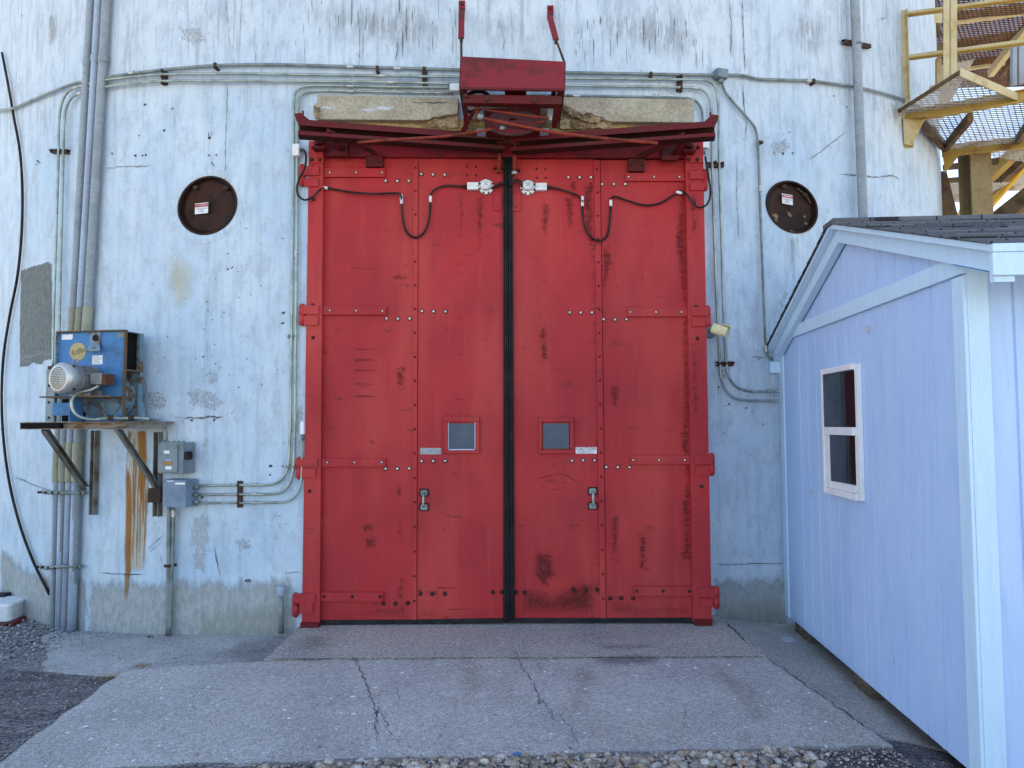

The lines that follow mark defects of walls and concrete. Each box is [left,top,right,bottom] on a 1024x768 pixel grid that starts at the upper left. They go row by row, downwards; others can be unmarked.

spalling [560,106,612,129]
crack [813,131,910,196]
peeling [19,262,52,367]
rust [124,431,148,593]
crack [283,656,400,745]
crack [463,650,681,746]